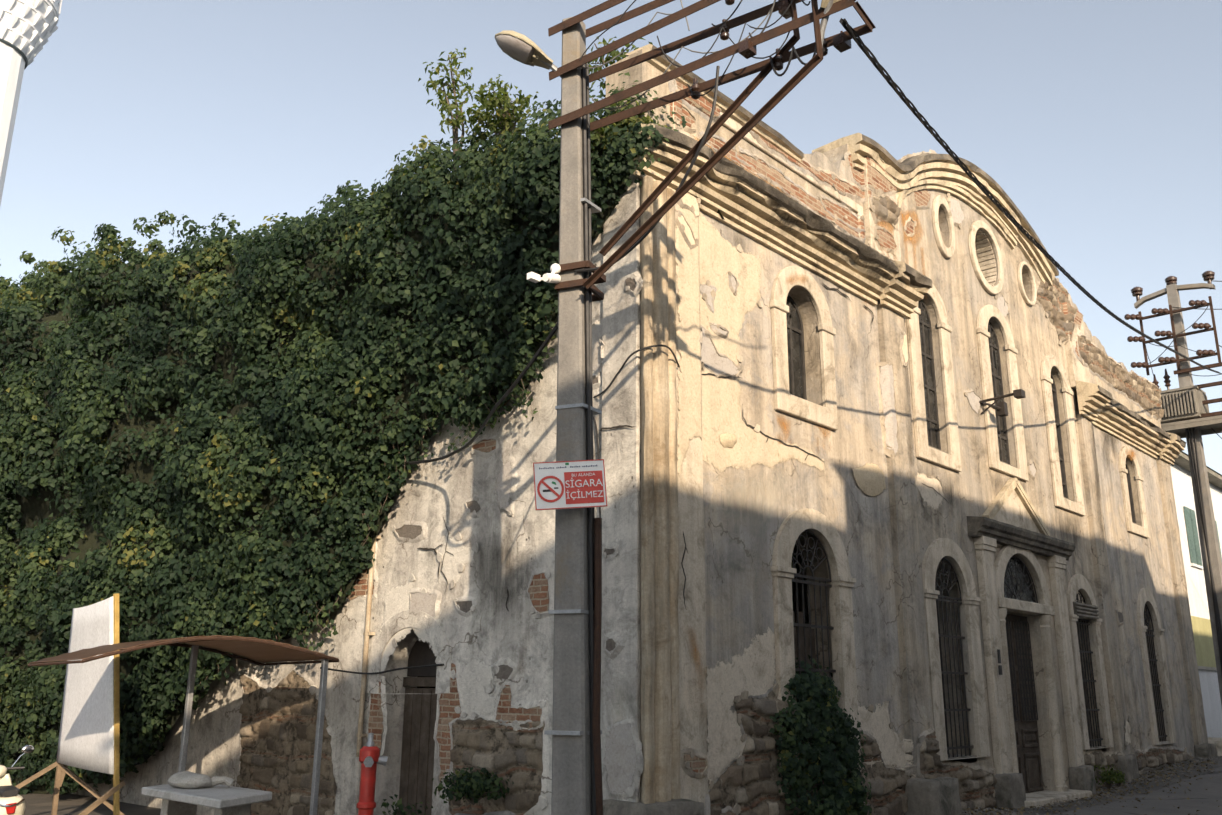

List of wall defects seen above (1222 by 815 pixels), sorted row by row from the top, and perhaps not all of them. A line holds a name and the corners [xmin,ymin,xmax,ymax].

flaking render [666,78,964,255]
peeling [675,192,826,476]
crack [702,373,824,462]
flaking render [237,666,340,815]
flaking render [367,676,387,756]
flaking render [433,656,549,815]
flaking render [680,681,824,815]